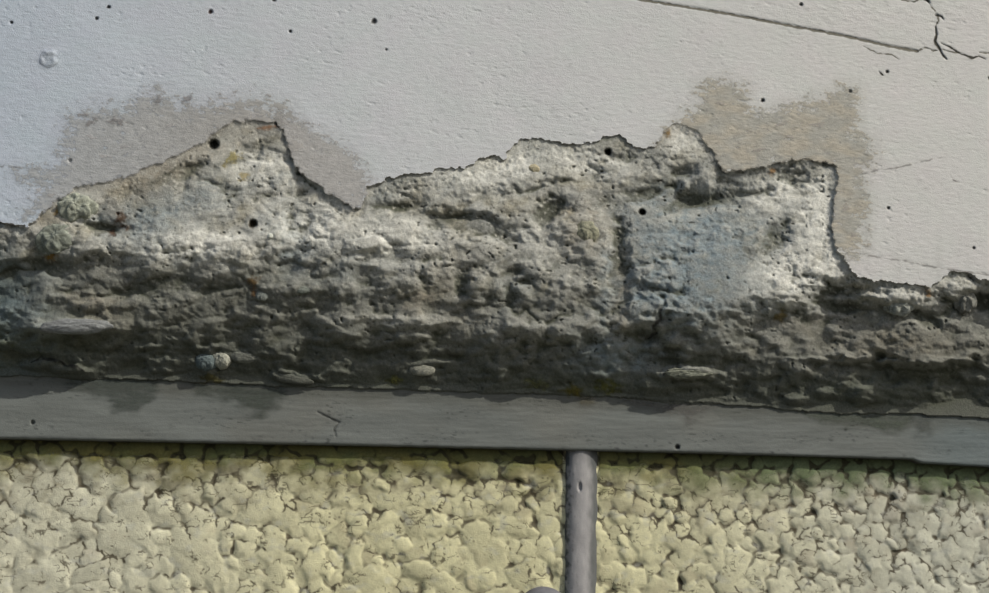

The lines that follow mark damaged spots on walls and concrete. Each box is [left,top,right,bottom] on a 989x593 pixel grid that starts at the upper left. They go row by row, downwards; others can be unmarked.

crack [639,0,989,76]
spalling [0,78,989,419]